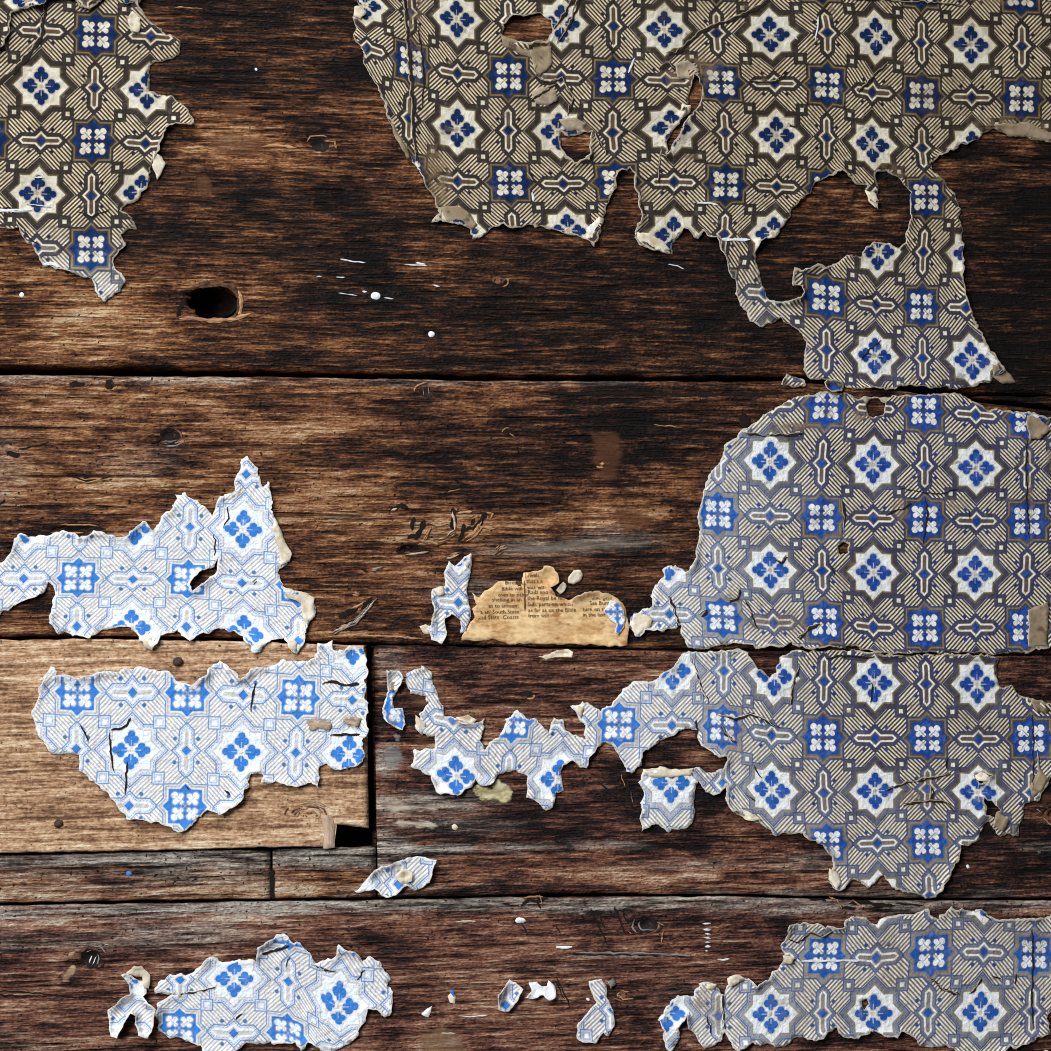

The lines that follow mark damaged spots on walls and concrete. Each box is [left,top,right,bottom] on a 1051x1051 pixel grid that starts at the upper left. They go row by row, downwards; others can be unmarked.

spalling [390,503,495,559]
peeling [557,570,583,594]
peeling [383,798,438,829]